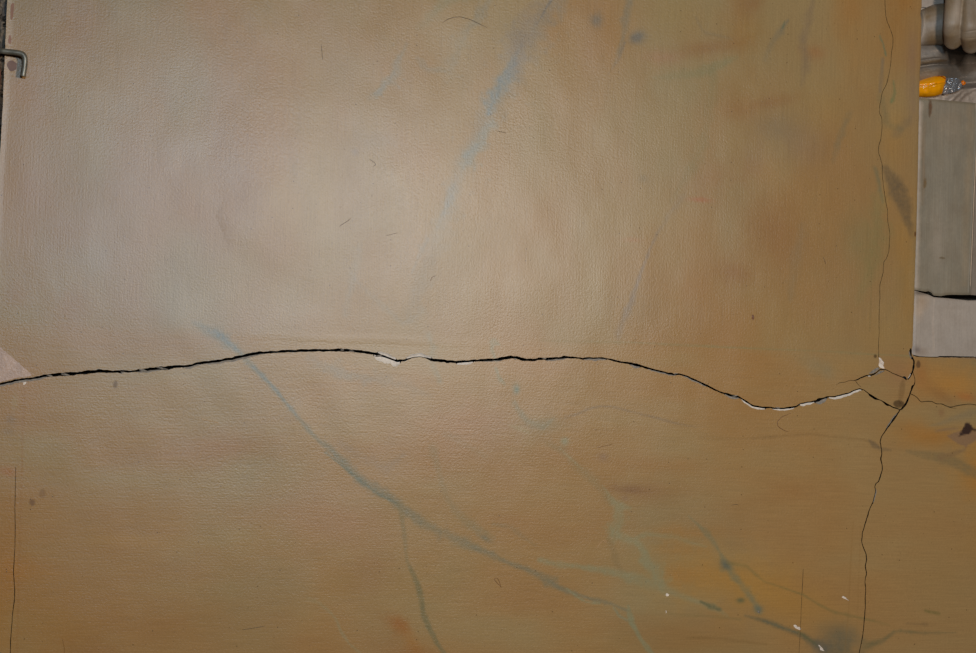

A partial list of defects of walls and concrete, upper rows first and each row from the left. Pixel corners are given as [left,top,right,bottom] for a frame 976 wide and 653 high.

crack [929,292,976,300]
crack [0,340,976,653]